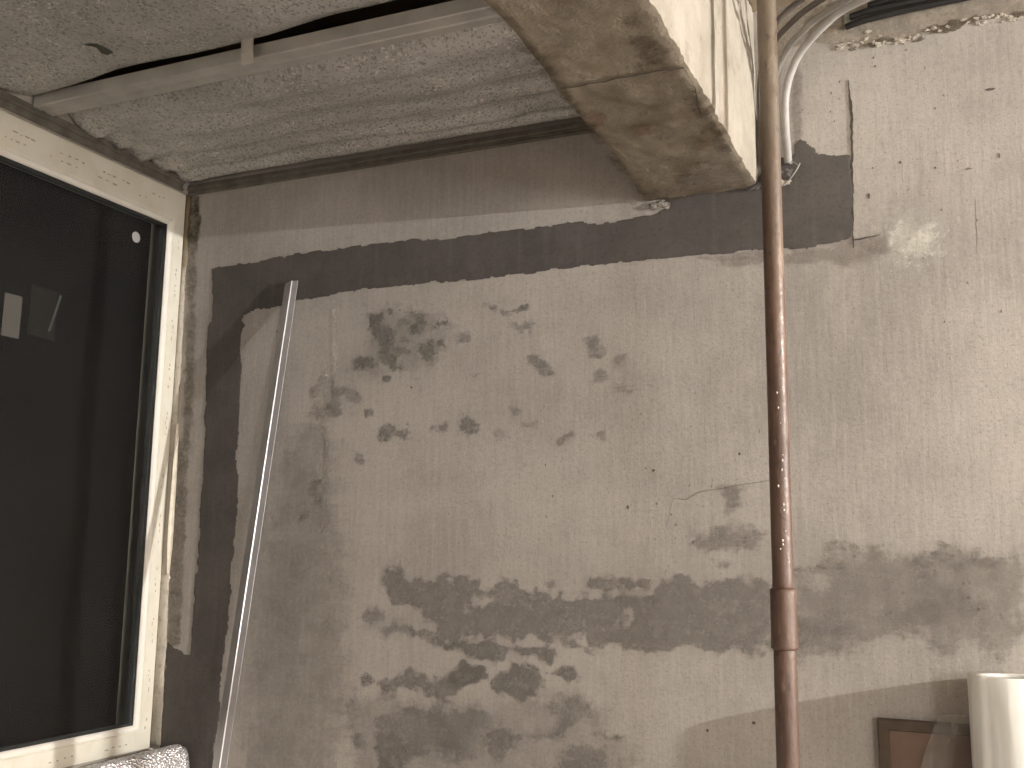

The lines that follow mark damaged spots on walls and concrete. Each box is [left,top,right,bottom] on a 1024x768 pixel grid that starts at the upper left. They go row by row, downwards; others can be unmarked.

spalling [776,0,1024,67]
water stain [887,219,940,267]
water stain [355,309,445,382]
water stain [169,240,197,645]
crack [666,480,768,526]
water stain [798,544,1023,652]
water stain [361,565,771,768]